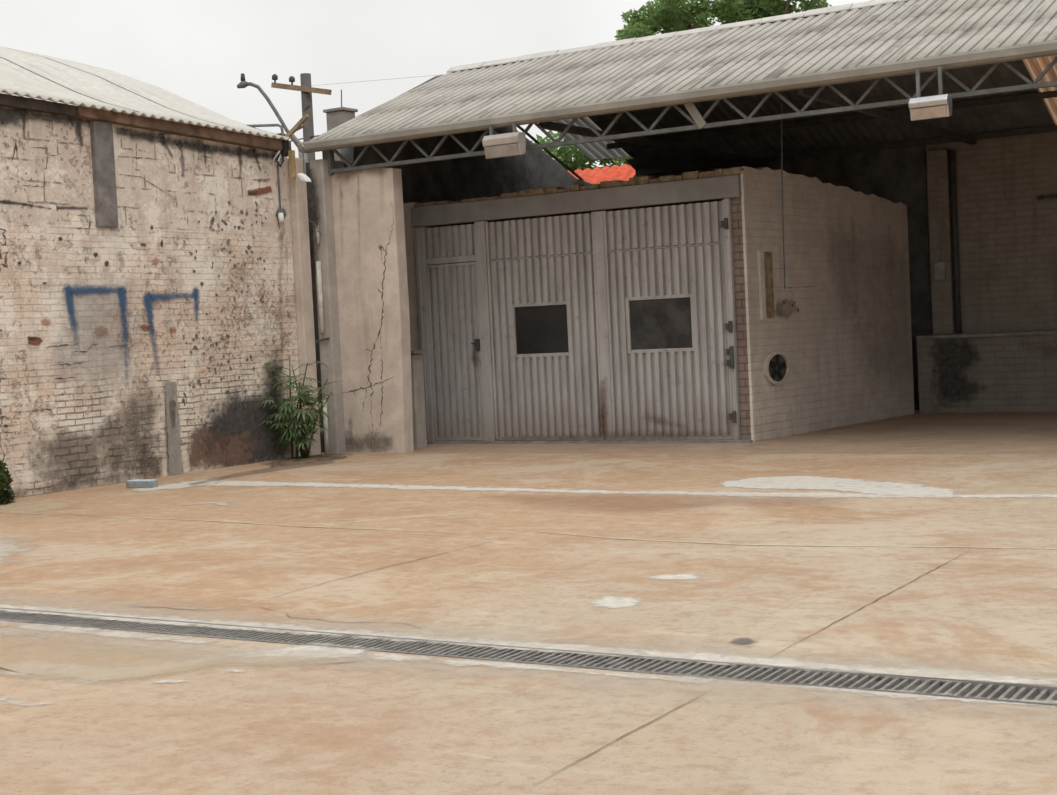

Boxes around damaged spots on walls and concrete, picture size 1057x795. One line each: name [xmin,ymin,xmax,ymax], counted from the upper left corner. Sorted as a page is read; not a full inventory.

crack [0,228,8,271]
spalling [27,336,42,348]
flaking render [32,408,163,482]
flaking render [182,179,272,470]
leakage [201,351,285,467]
crack [343,202,394,444]
leakage [932,339,984,406]